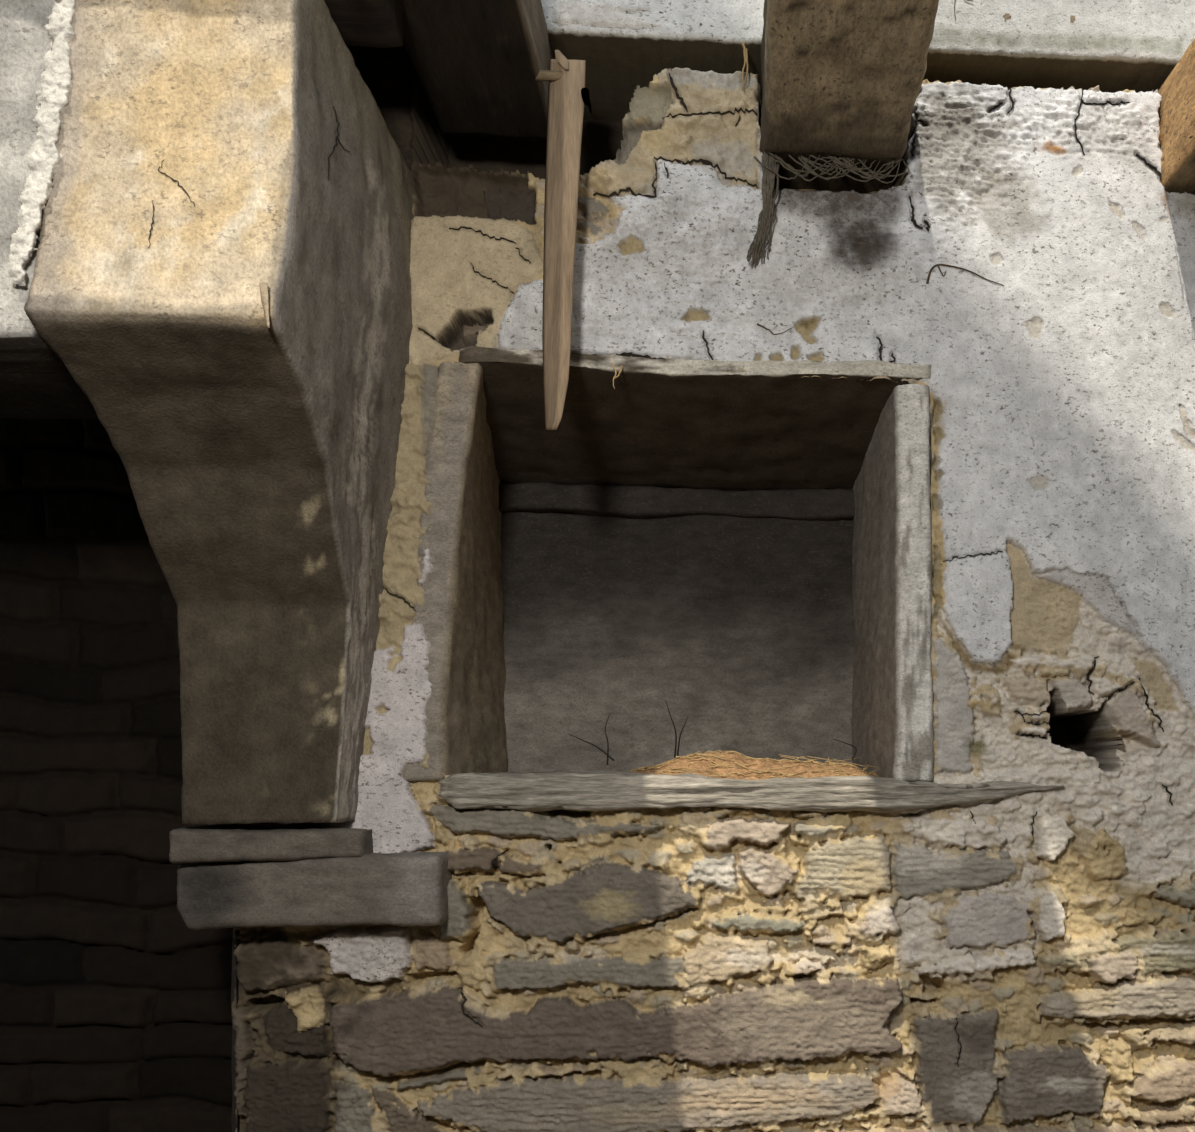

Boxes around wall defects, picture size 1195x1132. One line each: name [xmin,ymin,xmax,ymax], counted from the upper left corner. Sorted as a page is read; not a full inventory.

crack [148,160,195,249]
flaking render [617,234,645,256]
flaking render [582,67,760,198]
crack [593,156,758,198]
crack [660,73,757,127]
crack [899,111,930,231]
crack [1074,89,1130,155]
flaking render [931,399,945,510]
flaking render [320,623,436,854]
crack [1015,711,1049,739]
flaking render [932,542,1195,787]
crack [1086,656,1164,732]